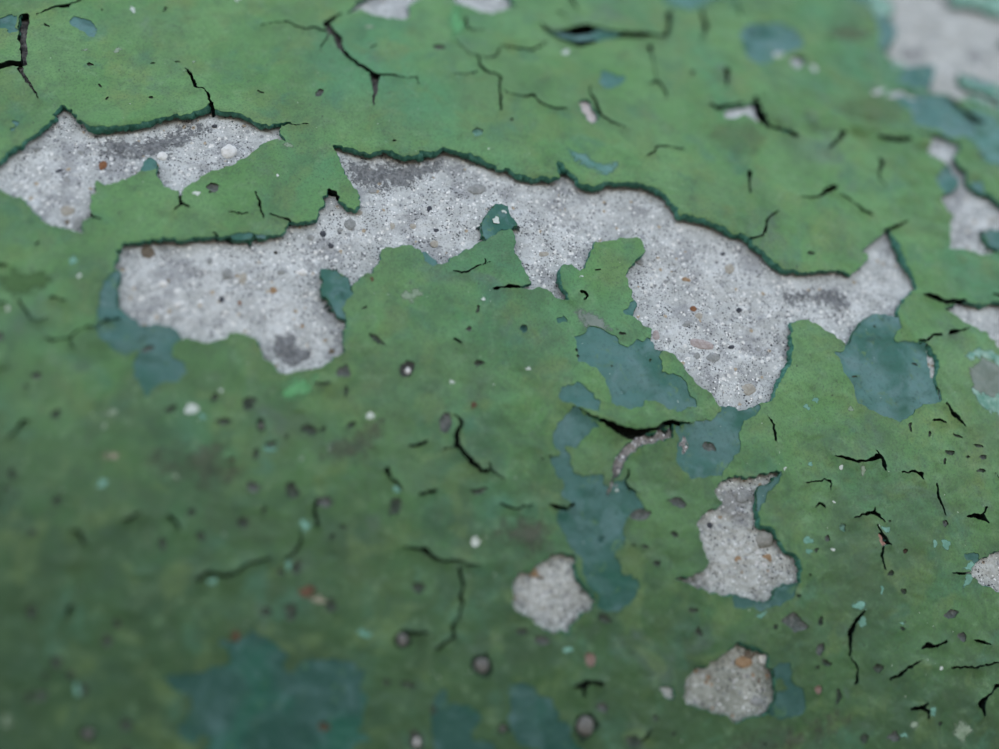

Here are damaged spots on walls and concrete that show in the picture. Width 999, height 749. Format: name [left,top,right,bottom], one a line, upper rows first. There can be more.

crack [0,0,81,98]
crack [261,13,419,105]
crack [454,0,673,111]
peeling [0,103,291,233]
peeling [871,0,999,255]
peeling [945,301,999,348]
peeling [90,139,942,636]
crack [573,406,692,440]
crack [806,450,990,523]
peeling [963,551,999,592]
peeling [659,641,823,724]
crack [890,639,999,719]